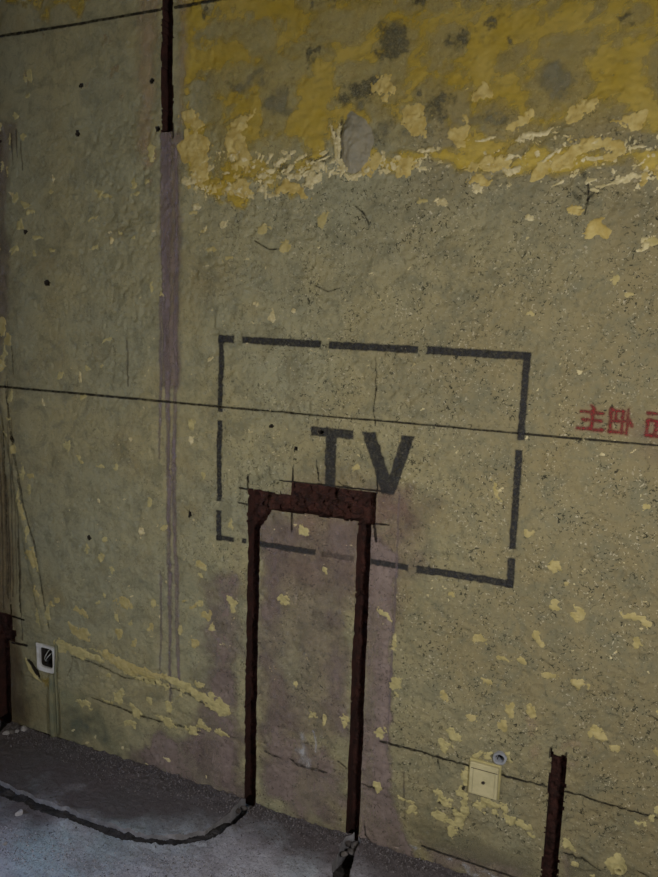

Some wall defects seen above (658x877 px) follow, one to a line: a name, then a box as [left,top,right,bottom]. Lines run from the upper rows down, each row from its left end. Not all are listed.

peeling [177,0,658,216]
peeling [582,217,612,239]
peeling [636,235,658,252]